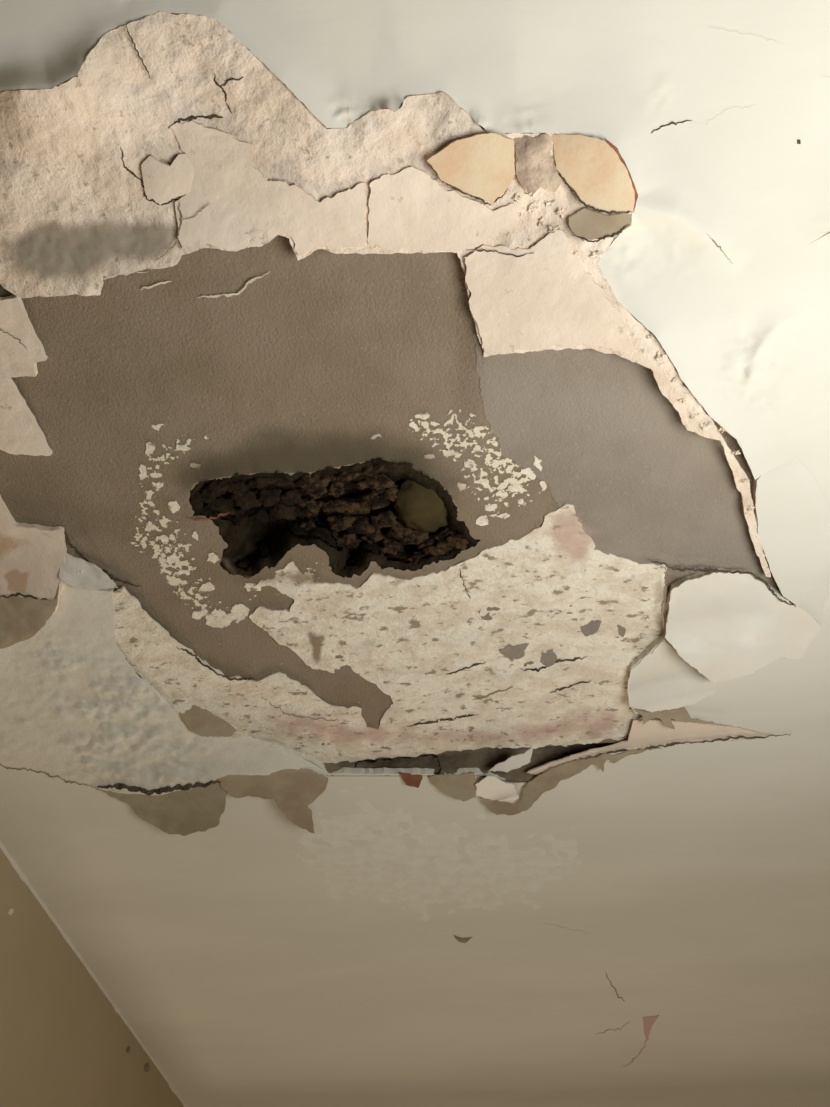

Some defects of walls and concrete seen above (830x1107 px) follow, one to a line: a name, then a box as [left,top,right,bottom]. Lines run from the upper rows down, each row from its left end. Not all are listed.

flaking render [0,11,821,836]
crack [651,105,752,134]